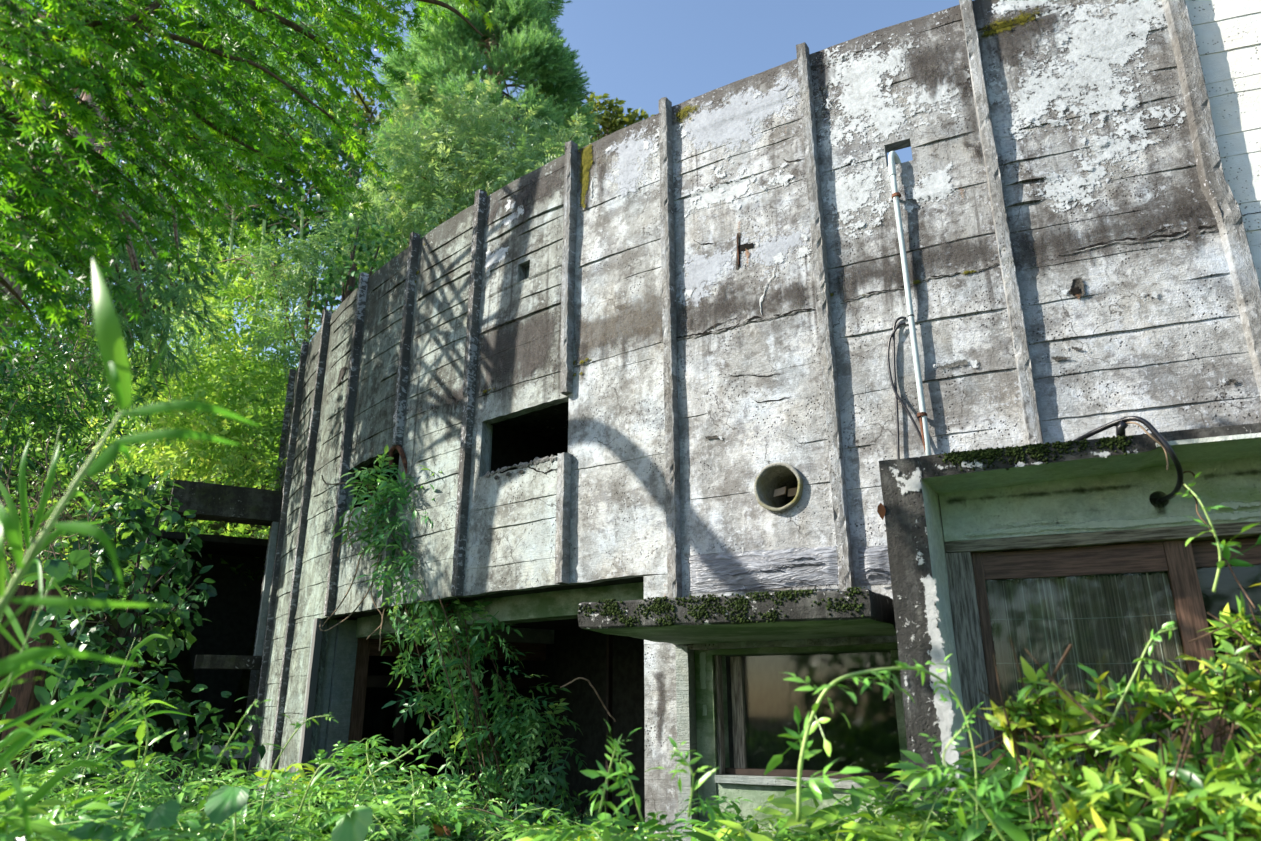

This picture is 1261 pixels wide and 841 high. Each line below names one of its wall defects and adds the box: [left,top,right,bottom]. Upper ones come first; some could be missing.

damp [984,8,1060,64]
damp [910,45,979,155]
damp [582,155,604,208]
crack [1058,212,1260,256]
damp [687,269,815,329]
crack [676,263,998,340]
peeling [889,460,983,496]
peeling [916,546,962,816]